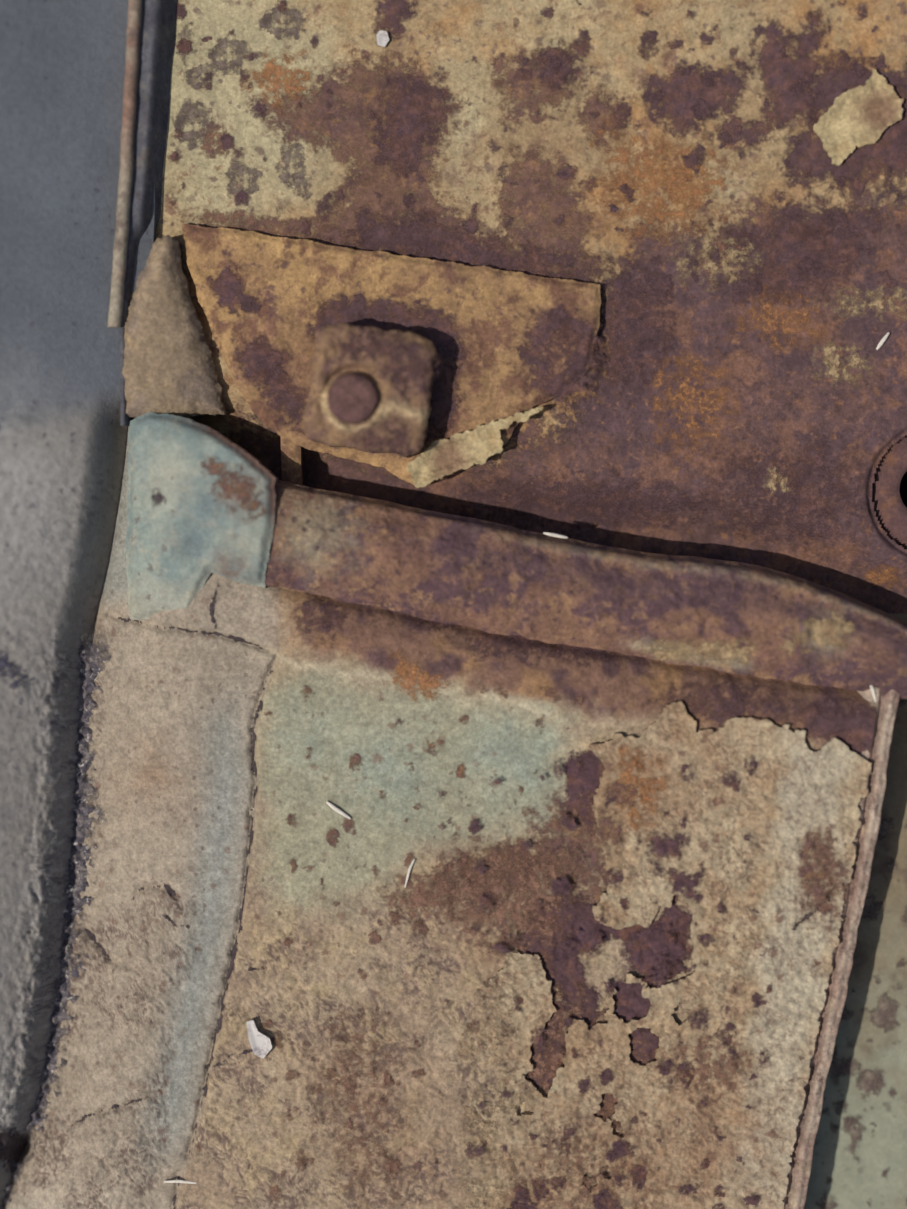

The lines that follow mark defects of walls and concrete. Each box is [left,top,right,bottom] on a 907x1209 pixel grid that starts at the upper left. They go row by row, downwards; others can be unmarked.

corrosion [374,0,417,40]
peeling [813,69,904,166]
corrosion [171,11,907,614]
peeling [406,407,543,488]
corrosion [466,631,618,667]
crack [118,584,273,1209]
corrosion [326,818,356,848]
corrosion [368,749,705,957]
peeling [434,701,872,1209]
corrosion [751,985,772,1008]
corrosion [578,1069,614,1093]
corrosion [465,1113,699,1209]